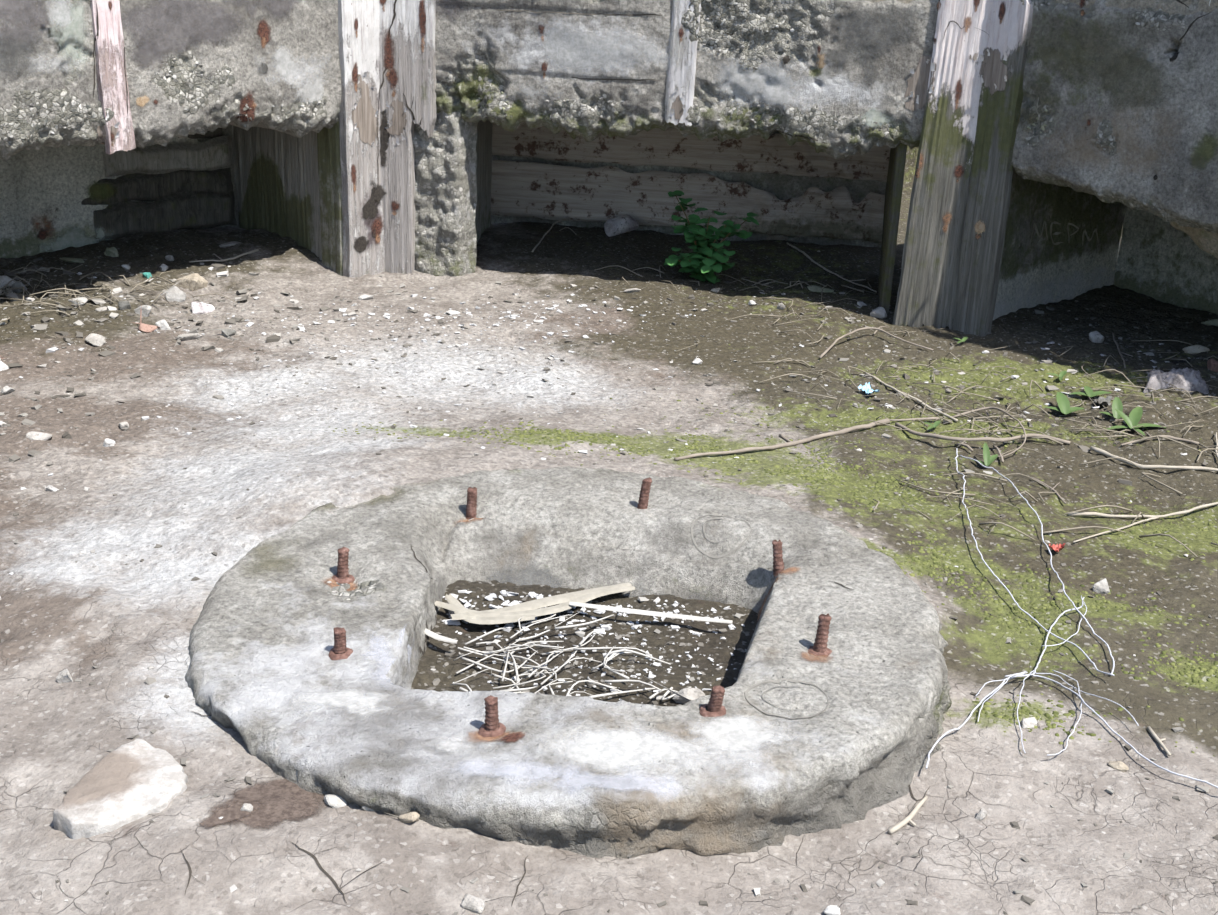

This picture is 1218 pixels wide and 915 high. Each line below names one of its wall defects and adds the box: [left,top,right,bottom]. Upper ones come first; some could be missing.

leakage [0,0,83,69]
spalling [150,55,235,117]
spalling [266,94,328,126]
spalling [447,74,513,122]
spalling [534,93,631,127]
spalling [663,87,898,143]
rust [757,567,798,622]
rust [471,732,524,742]
crack [181,850,205,893]